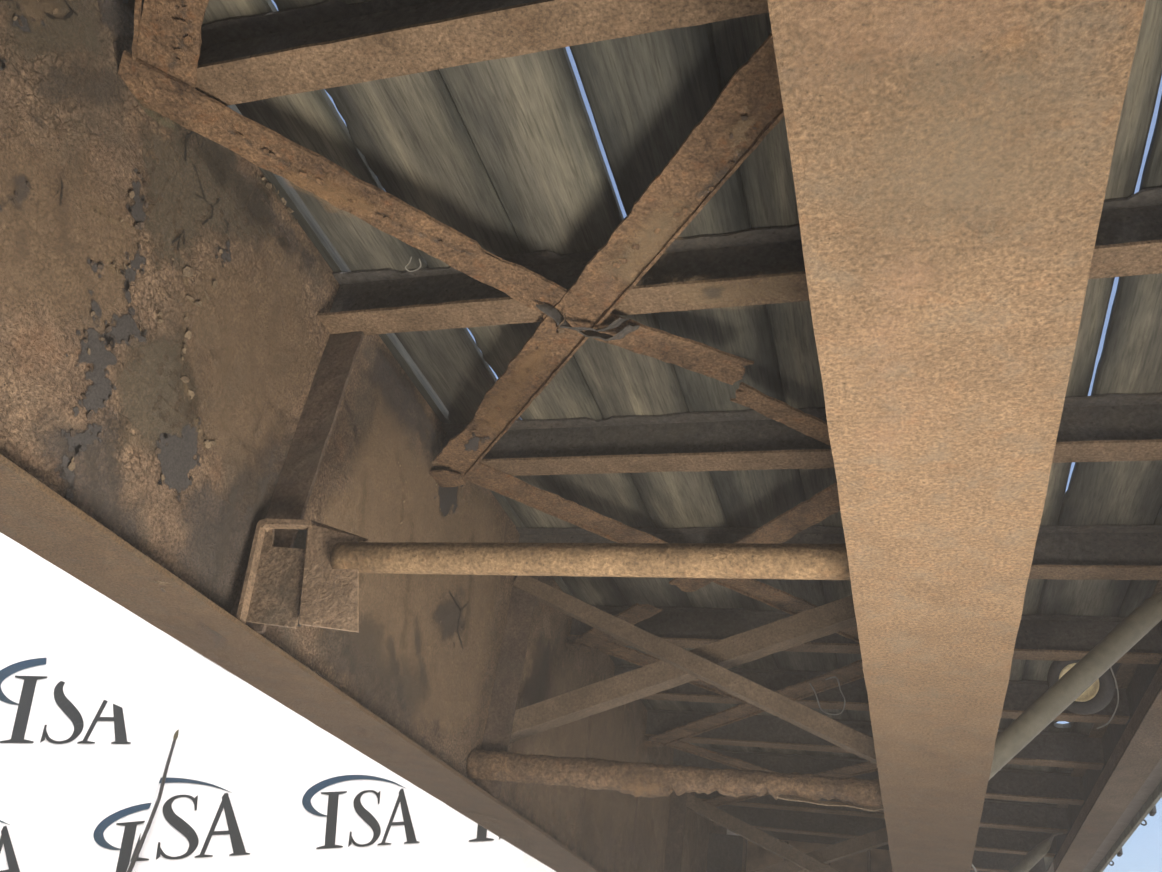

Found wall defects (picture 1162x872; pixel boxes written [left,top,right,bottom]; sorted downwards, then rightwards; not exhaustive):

spalling [120,168,150,230]
spalling [54,244,147,498]
spalling [151,418,216,502]